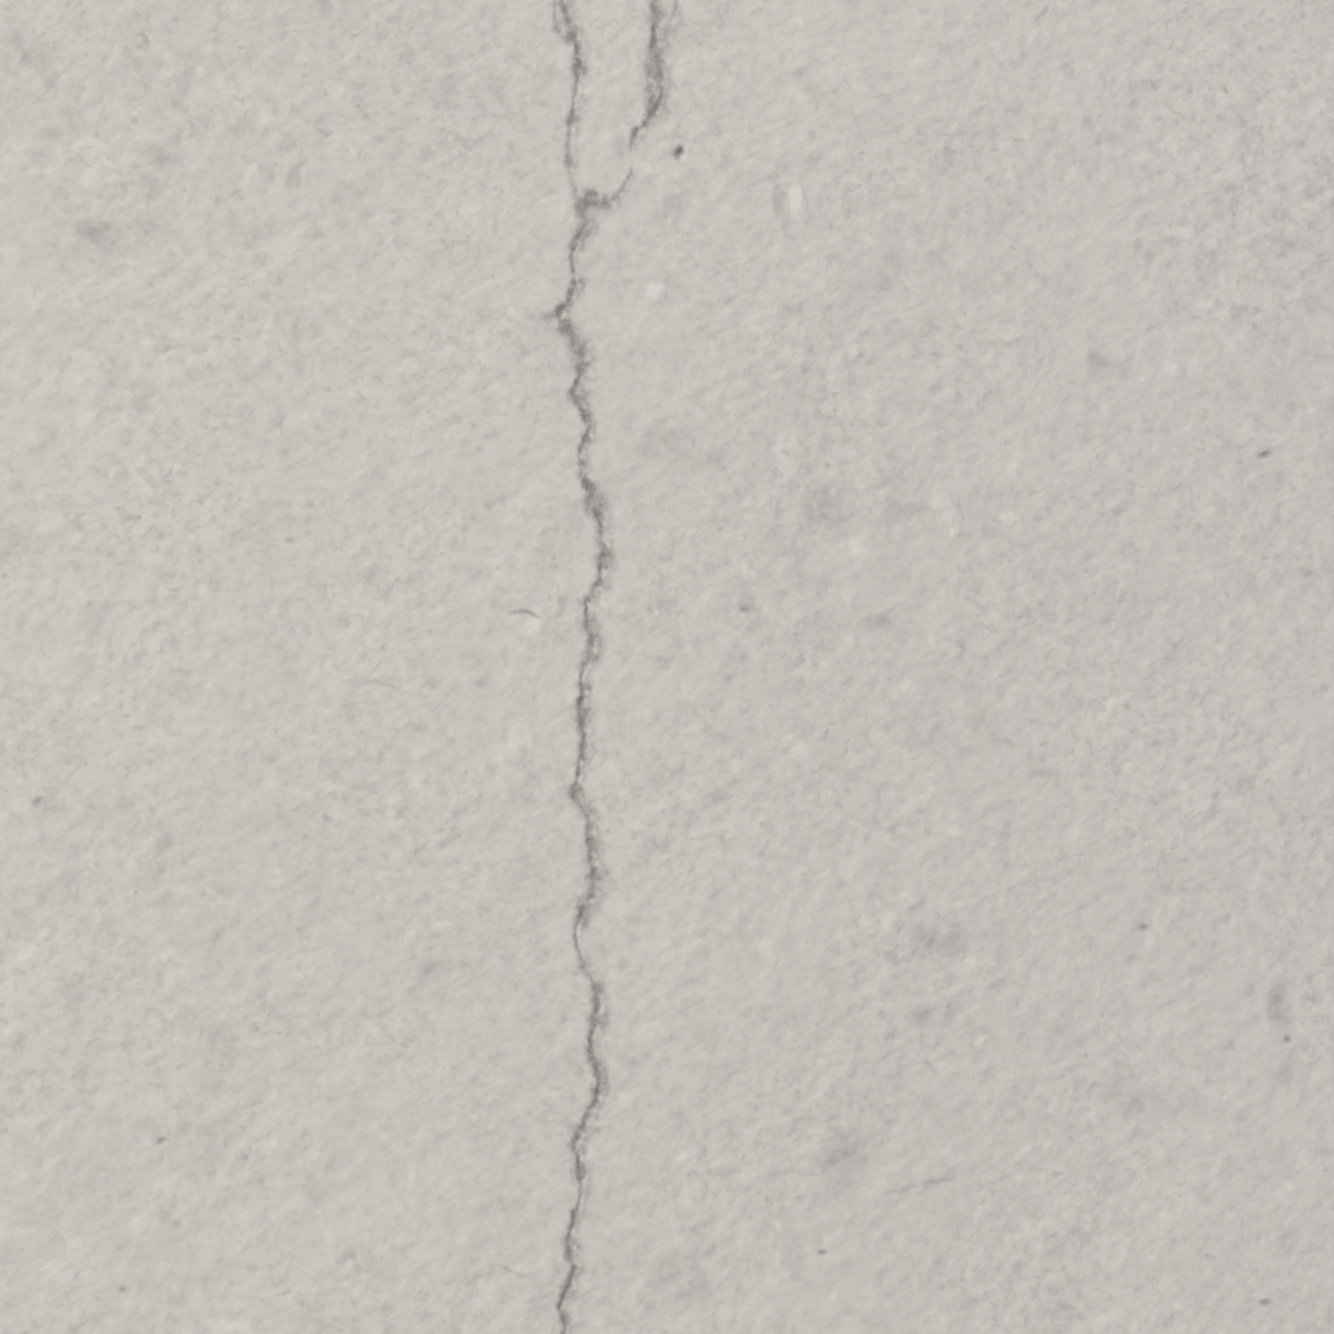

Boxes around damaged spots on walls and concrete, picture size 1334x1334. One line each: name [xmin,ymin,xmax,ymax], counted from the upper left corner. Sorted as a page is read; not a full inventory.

crack [491,0,684,1334]